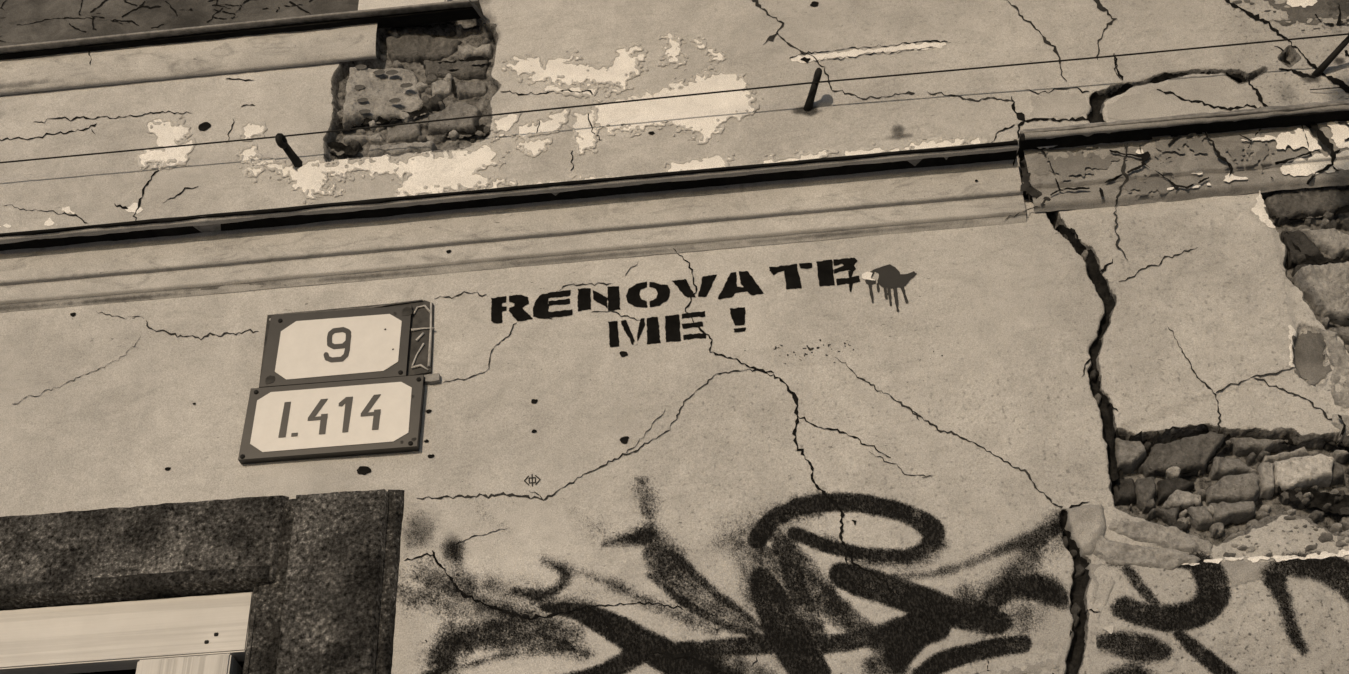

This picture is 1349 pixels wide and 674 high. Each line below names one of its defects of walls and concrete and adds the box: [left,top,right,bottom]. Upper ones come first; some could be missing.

flaking render [1232,0,1349,31]
peeling [791,41,946,63]
crack [0,110,189,141]
flaking render [236,22,764,204]
peeling [757,133,988,164]
flaking render [1028,76,1261,122]
crack [4,204,87,223]
crack [114,170,198,221]
crack [752,0,1349,481]
flaking render [1034,121,1349,586]
crack [835,357,1100,674]